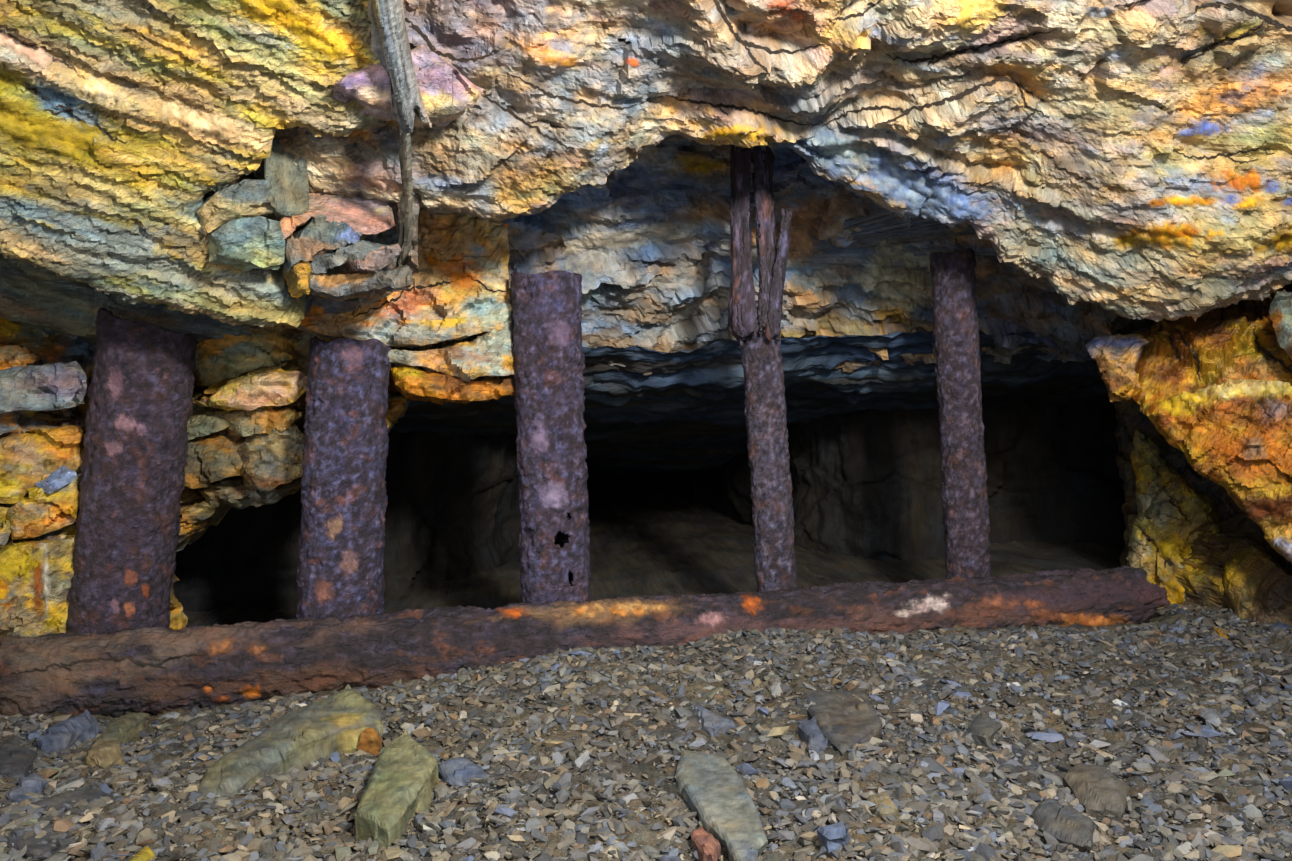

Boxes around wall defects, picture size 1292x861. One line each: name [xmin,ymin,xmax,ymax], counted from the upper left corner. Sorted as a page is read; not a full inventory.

rust [550,321,570,346]
rust [107,368,123,398]
rust [105,415,146,456]
rust [530,423,548,451]
rust [539,483,567,508]
rust [328,517,343,538]
rust [340,552,358,573]
rust [111,570,149,617]
rust [575,603,665,617]
rust [701,613,721,625]
rust [744,597,759,610]
rust [982,595,1107,627]